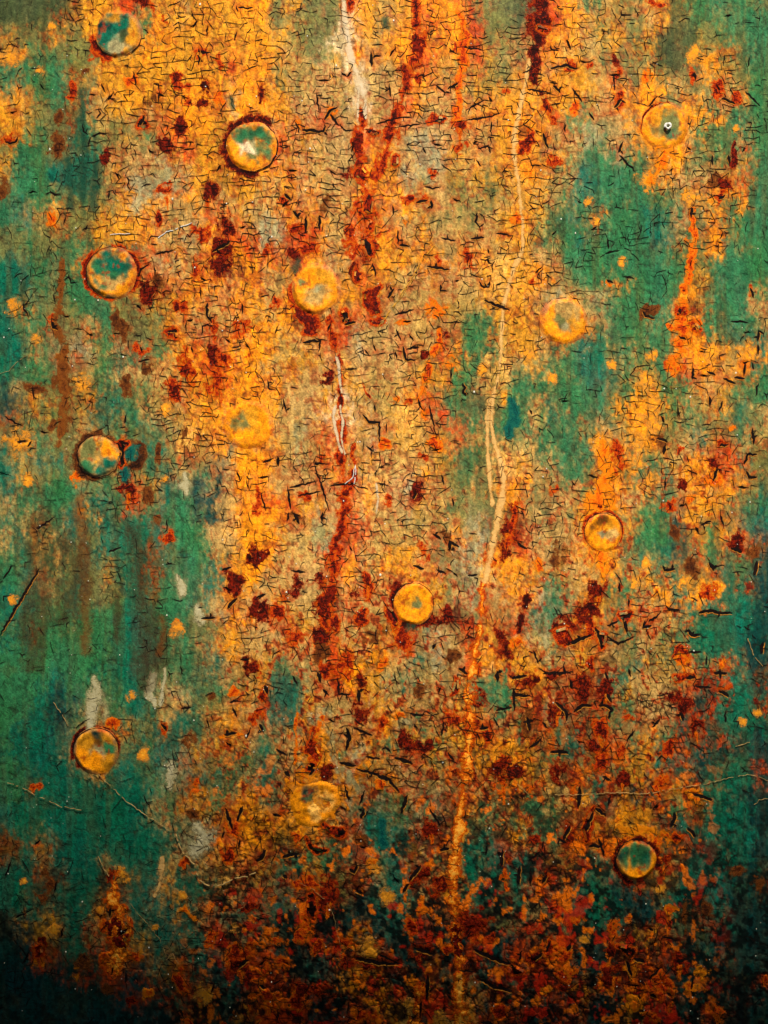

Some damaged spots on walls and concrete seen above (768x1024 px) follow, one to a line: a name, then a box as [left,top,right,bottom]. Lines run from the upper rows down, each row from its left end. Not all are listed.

rust [190,176,237,282]
rust [340,0,431,284]
crack [416,200,433,208]
rust [524,0,557,125]
crack [0,381,61,481]
rust [548,124,743,640]
crack [0,516,83,700]
crack [73,538,205,681]
rust [218,314,454,756]
crack [64,672,226,776]
rust [402,580,535,1024]
crack [590,844,748,1024]